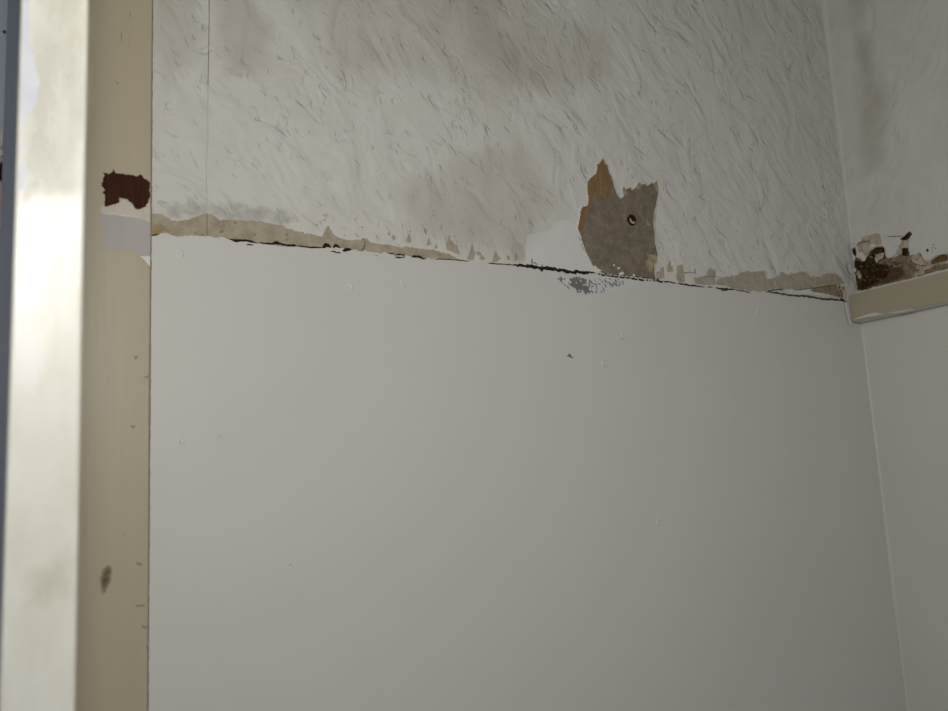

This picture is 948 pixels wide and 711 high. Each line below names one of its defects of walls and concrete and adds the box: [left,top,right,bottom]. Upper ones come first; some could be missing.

flaking render [101,170,518,262]
crack [230,239,466,261]
crack [489,260,845,302]
peeling [557,156,847,302]
flaking render [914,253,948,276]